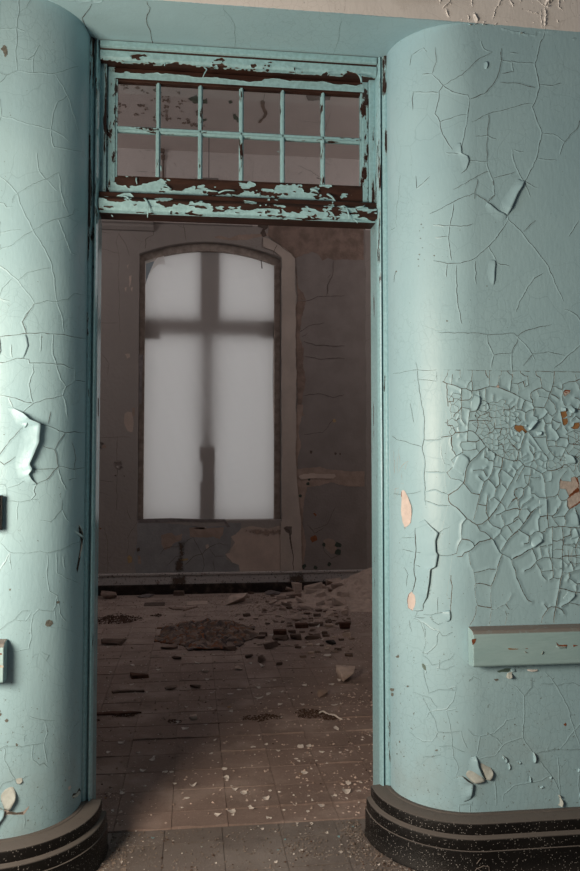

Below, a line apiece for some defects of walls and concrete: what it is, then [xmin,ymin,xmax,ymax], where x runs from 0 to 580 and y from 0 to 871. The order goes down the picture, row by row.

crack [146,1,154,43]
peeling [100,40,377,127]
peeling [461,0,565,27]
crack [409,23,580,374]
crack [0,153,86,661]
spalling [99,175,377,570]
crack [390,362,452,533]
peeling [400,369,580,626]
peeling [0,778,29,821]
peeling [457,756,493,802]
crack [409,590,580,806]